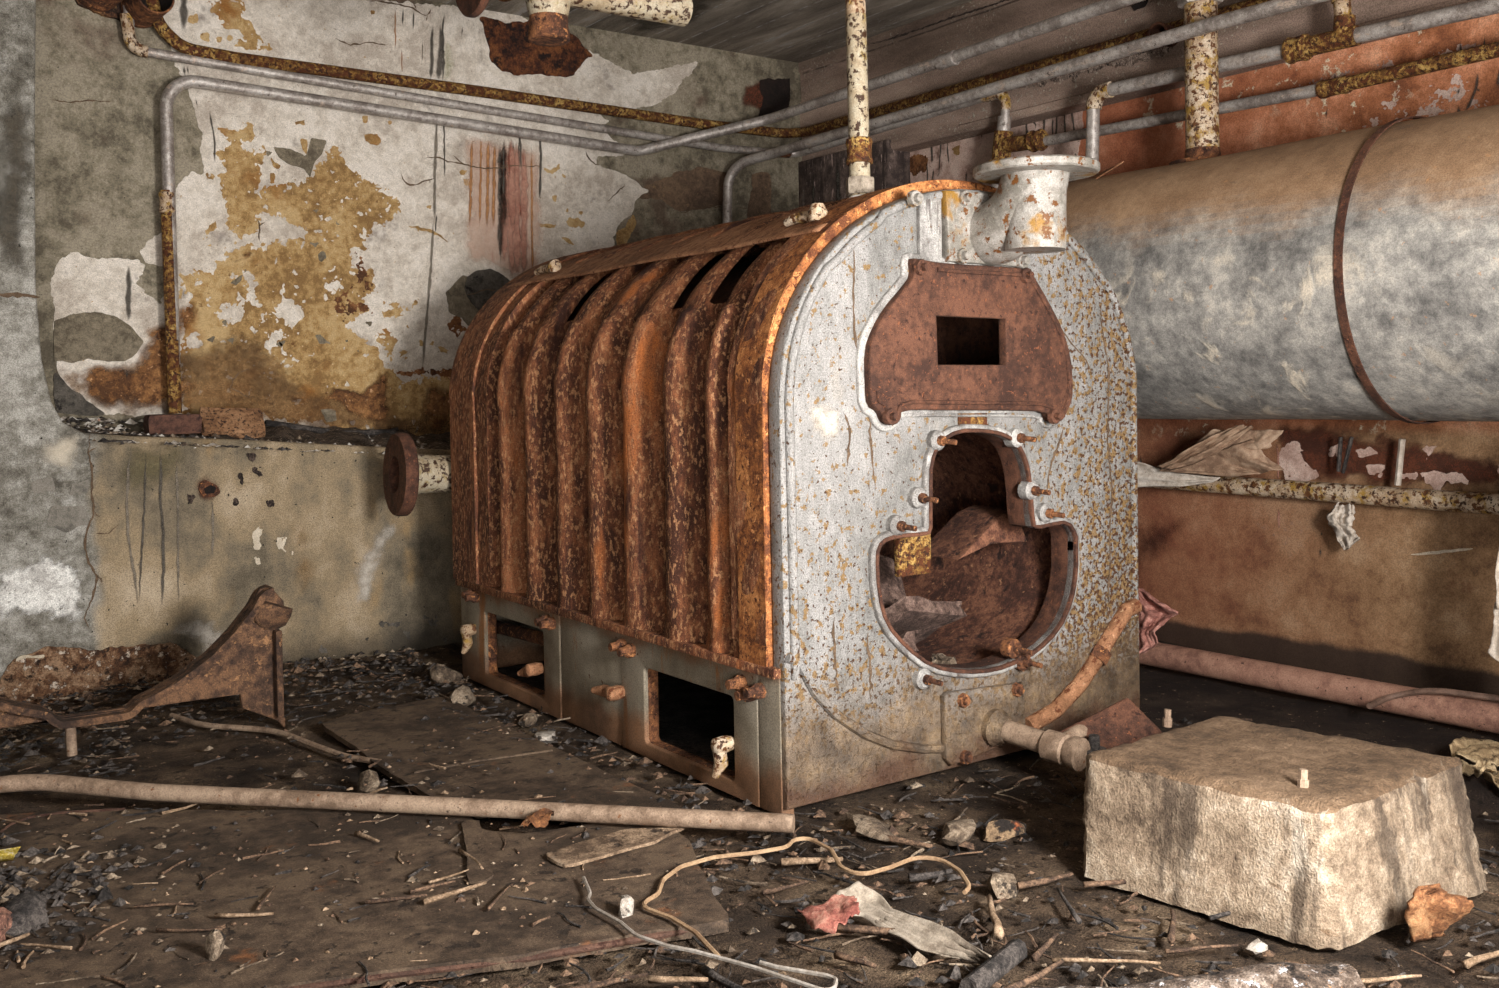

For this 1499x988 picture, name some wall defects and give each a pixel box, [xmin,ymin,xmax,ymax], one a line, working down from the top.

peeling [1362,74,1488,128]
peeling [910,111,1084,186]
peeling [50,0,727,436]
corrosion [468,138,542,273]
peeling [1279,441,1319,481]
peeling [1356,446,1385,478]
peeling [1402,446,1469,490]